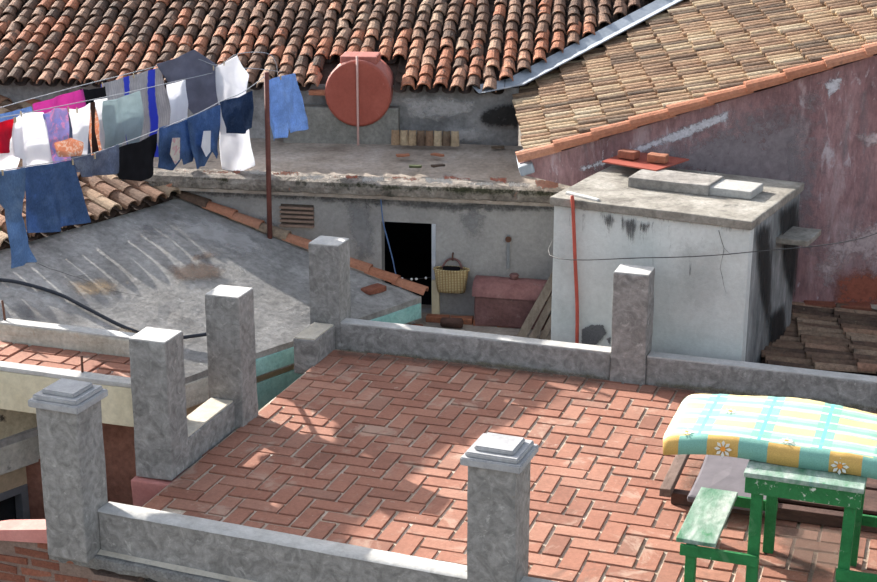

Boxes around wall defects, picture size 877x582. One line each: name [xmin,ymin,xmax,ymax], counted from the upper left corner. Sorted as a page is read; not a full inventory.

peeling [825,78,842,96]
peeling [634,112,728,152]
damp [606,215,649,238]
peeling [819,223,877,305]